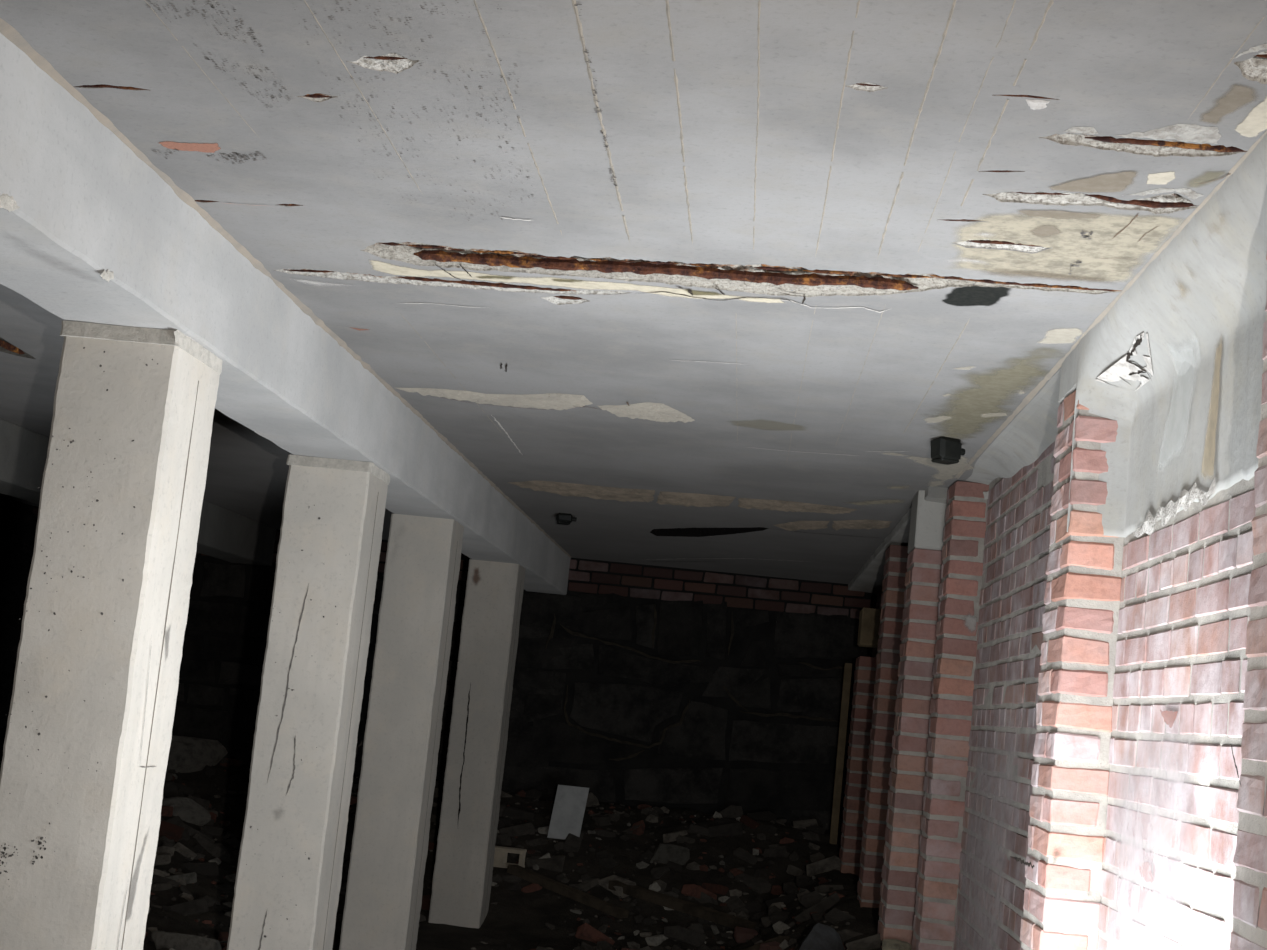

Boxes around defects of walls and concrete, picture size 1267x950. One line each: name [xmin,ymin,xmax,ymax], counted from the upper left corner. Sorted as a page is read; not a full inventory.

spalling [1231,44,1267,84]
spalling [193,0,533,223]
spalling [1039,124,1247,157]
spalling [982,188,1204,214]
spalling [275,242,1121,305]
leakage [942,210,1178,306]
crack [1120,335,1150,383]
crack [267,584,309,794]
crack [458,683,471,820]
crack [258,908,268,950]